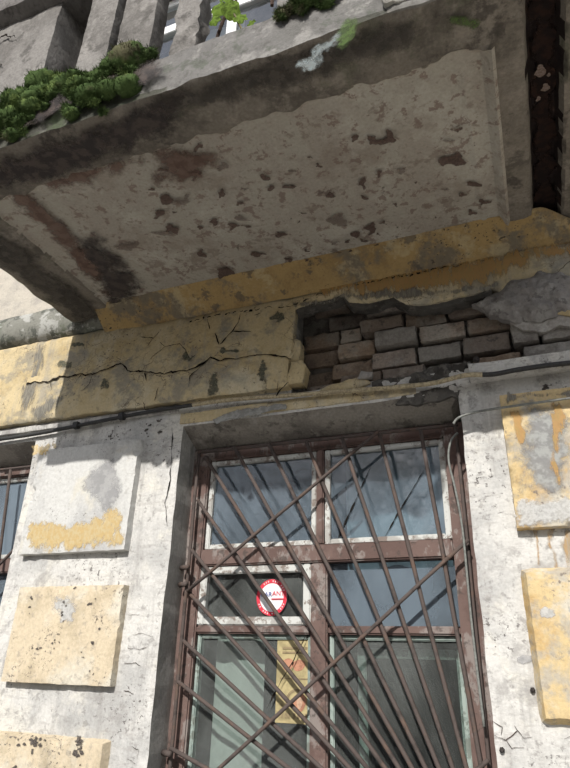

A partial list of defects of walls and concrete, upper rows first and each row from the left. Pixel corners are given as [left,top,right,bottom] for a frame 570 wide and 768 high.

peeling [351,129,396,145]
leakage [0,22,416,303]
peeling [438,152,466,166]
peeling [260,174,296,191]
peeling [149,188,189,219]
peeling [327,213,387,253]
leakage [0,239,96,323]
peeling [217,267,235,279]
crack [26,293,322,410]
flaking render [296,289,570,393]
flaking render [395,383,459,407]
crack [493,721,530,749]